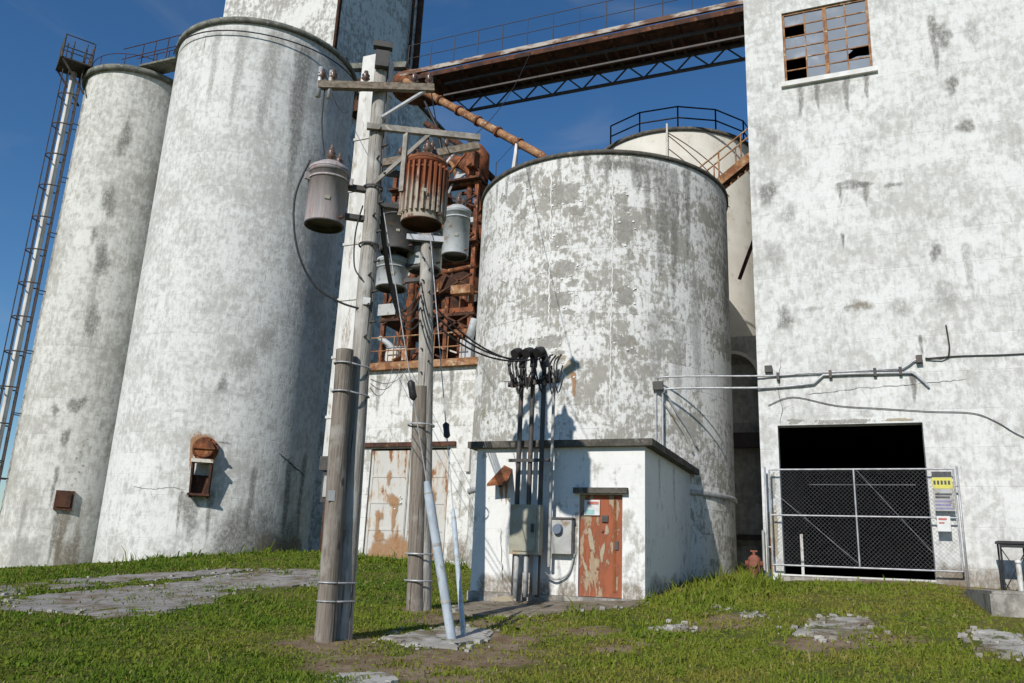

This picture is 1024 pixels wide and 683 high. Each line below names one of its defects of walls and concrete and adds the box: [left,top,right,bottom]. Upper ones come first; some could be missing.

corrosion [368,471,408,558]
peeling [582,525,609,577]